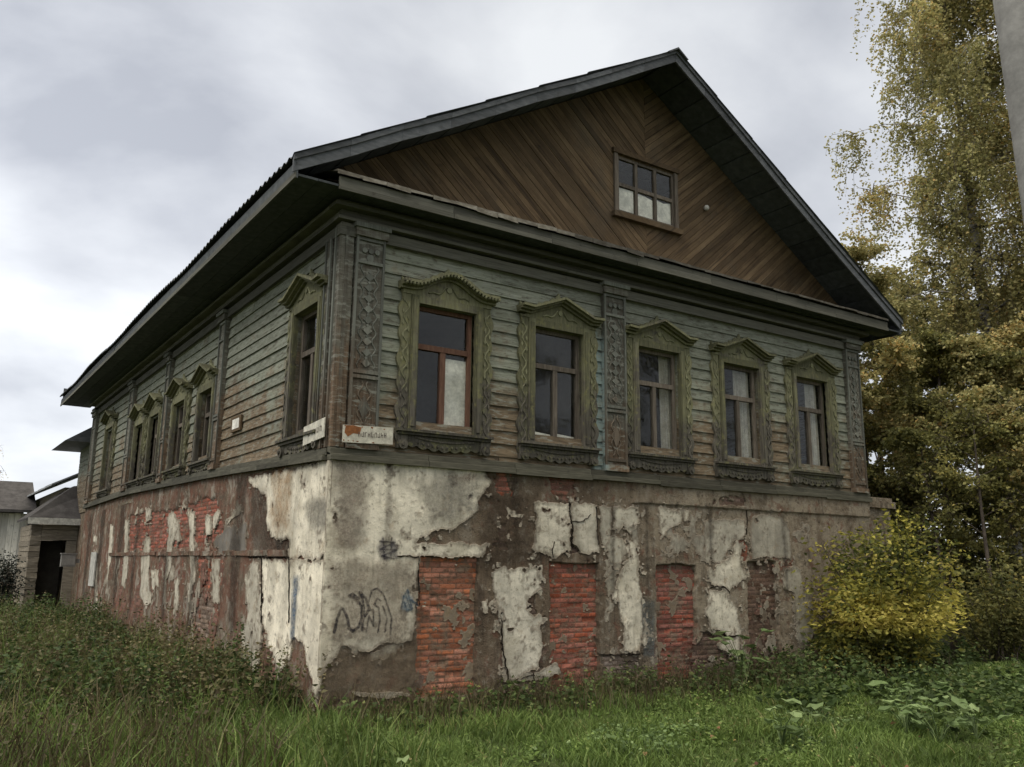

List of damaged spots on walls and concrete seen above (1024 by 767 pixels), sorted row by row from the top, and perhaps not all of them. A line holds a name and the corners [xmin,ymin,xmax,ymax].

flaking render [112,459,817,716]
crack [552,501,599,557]